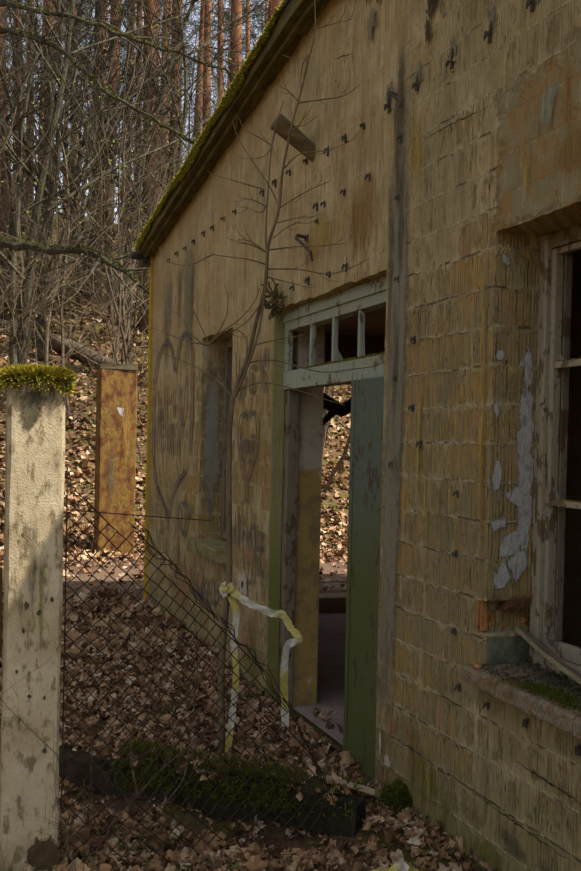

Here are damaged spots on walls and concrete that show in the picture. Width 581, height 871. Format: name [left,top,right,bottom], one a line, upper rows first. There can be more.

peeling [491,345,535,590]
spalling [476,597,531,636]